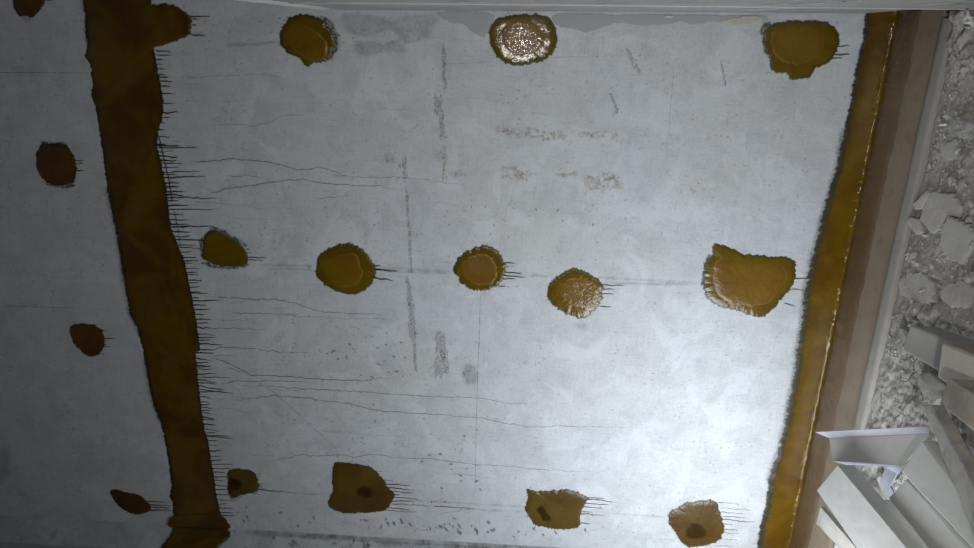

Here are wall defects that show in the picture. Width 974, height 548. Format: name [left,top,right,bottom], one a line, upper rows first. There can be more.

crack [193,158,412,204]
crack [208,296,562,476]